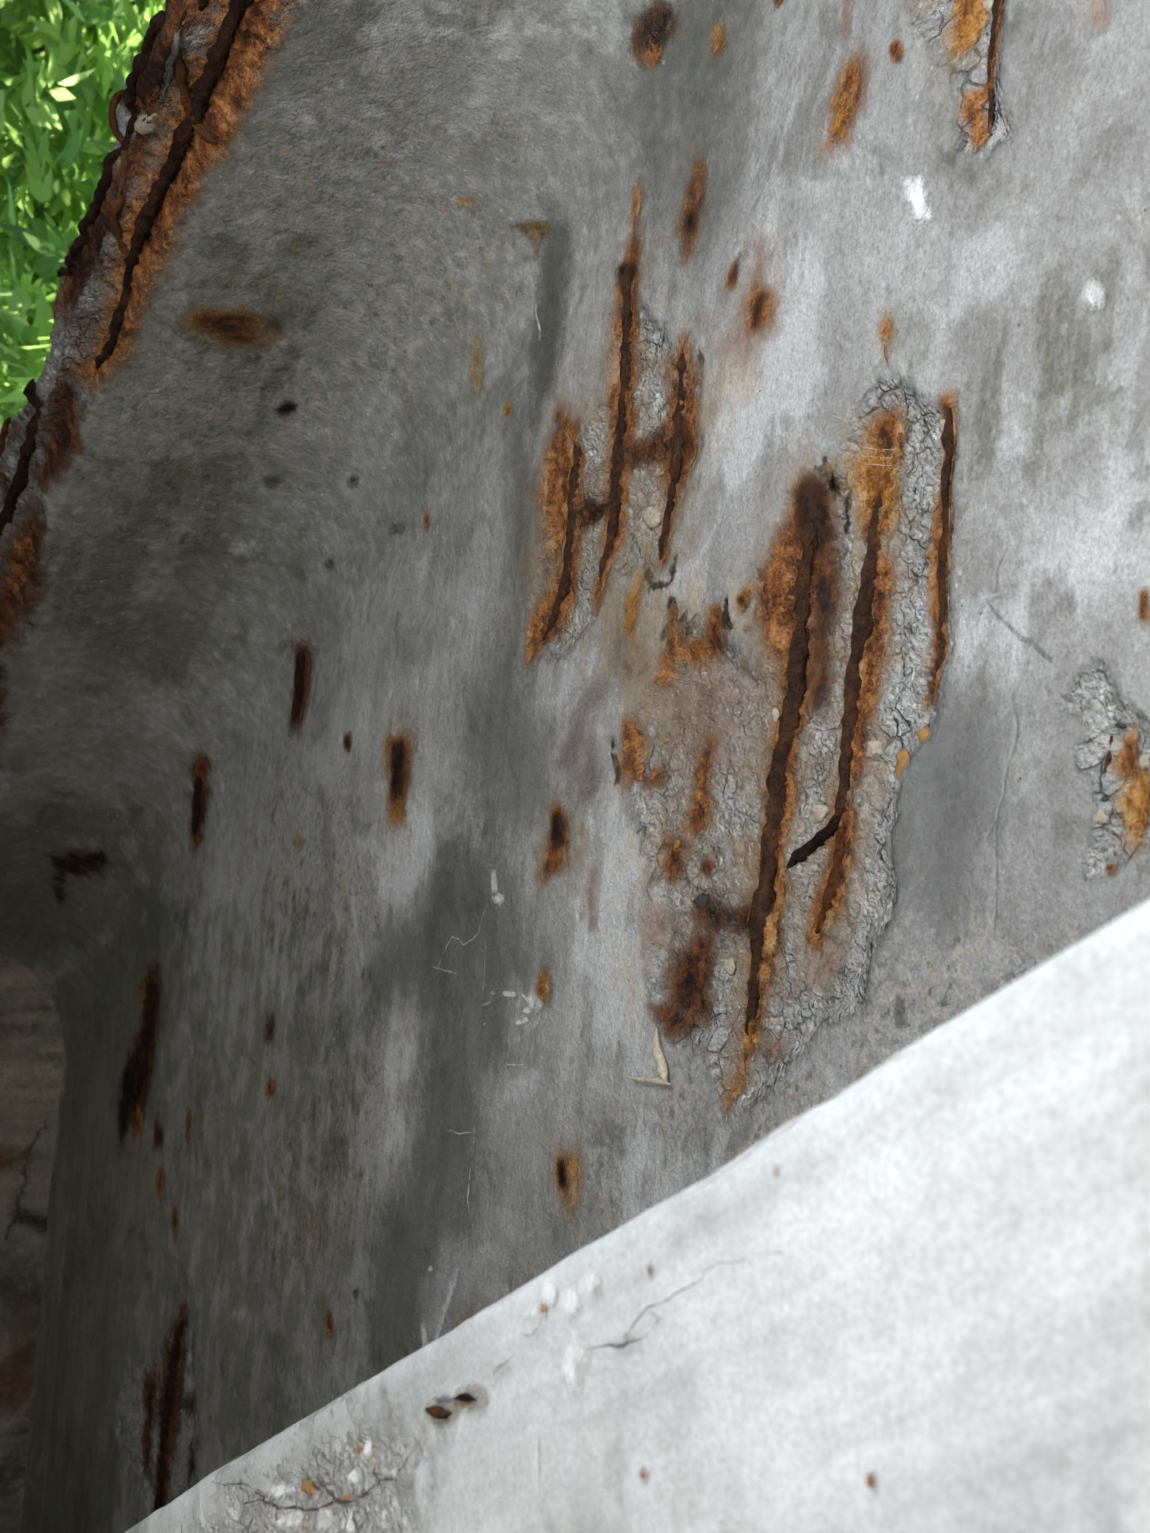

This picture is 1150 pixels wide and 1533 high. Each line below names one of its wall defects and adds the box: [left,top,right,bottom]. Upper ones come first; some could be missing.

rust [819,52,869,151]
rust [889,39,903,62]
spalling [905,0,1013,161]
rust [673,157,707,264]
rust [190,306,276,347]
rust [624,572,642,658]
rust [684,581,755,668]
rust [382,729,412,831]
spalling [617,375,959,1122]
spalling [1061,656,1150,880]
crack [585,1252,788,1350]
spalling [204,1383,487,1533]